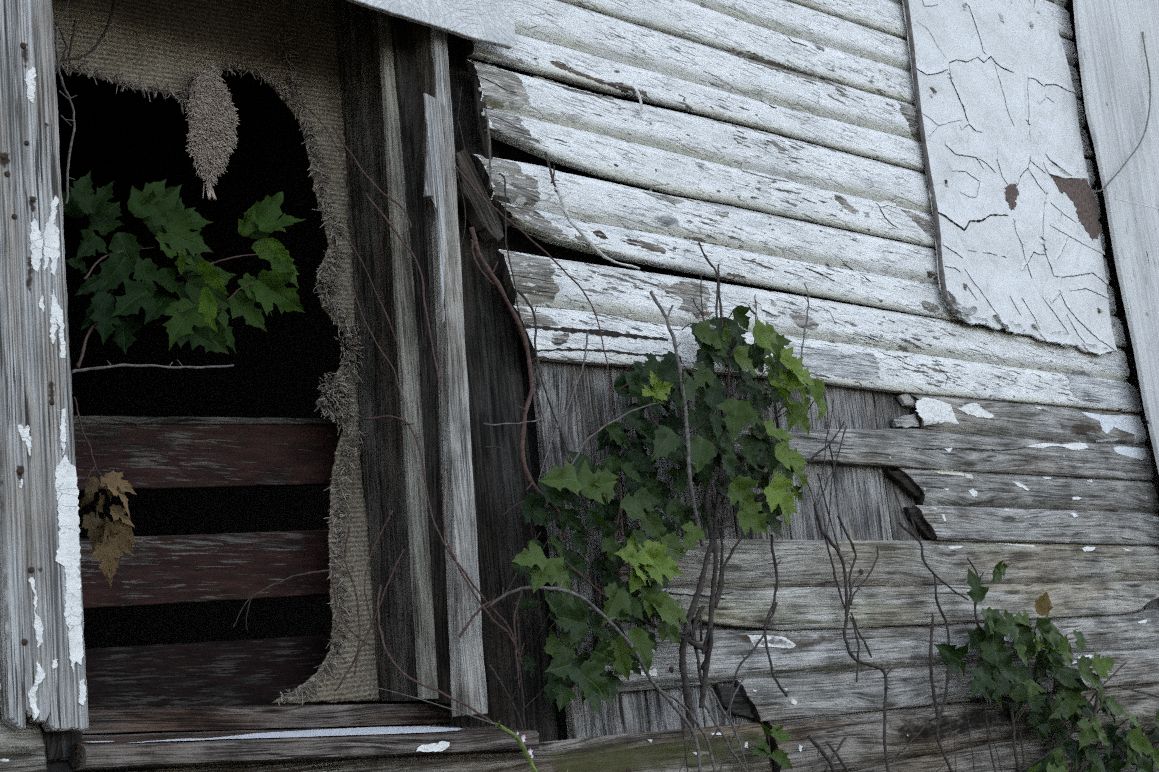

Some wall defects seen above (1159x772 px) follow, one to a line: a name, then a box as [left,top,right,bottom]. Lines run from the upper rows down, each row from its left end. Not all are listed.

peeling [470,48,652,142]
peeling [727,46,835,86]
peeling [474,154,676,254]
peeling [834,194,870,218]
crack [916,0,1117,351]
peeling [498,250,569,345]
peeling [658,273,745,319]
peeling [920,291,1113,355]
peeling [17,424,31,456]
peeling [915,388,994,426]
peeling [1026,370,1147,460]
peeling [28,408,86,720]